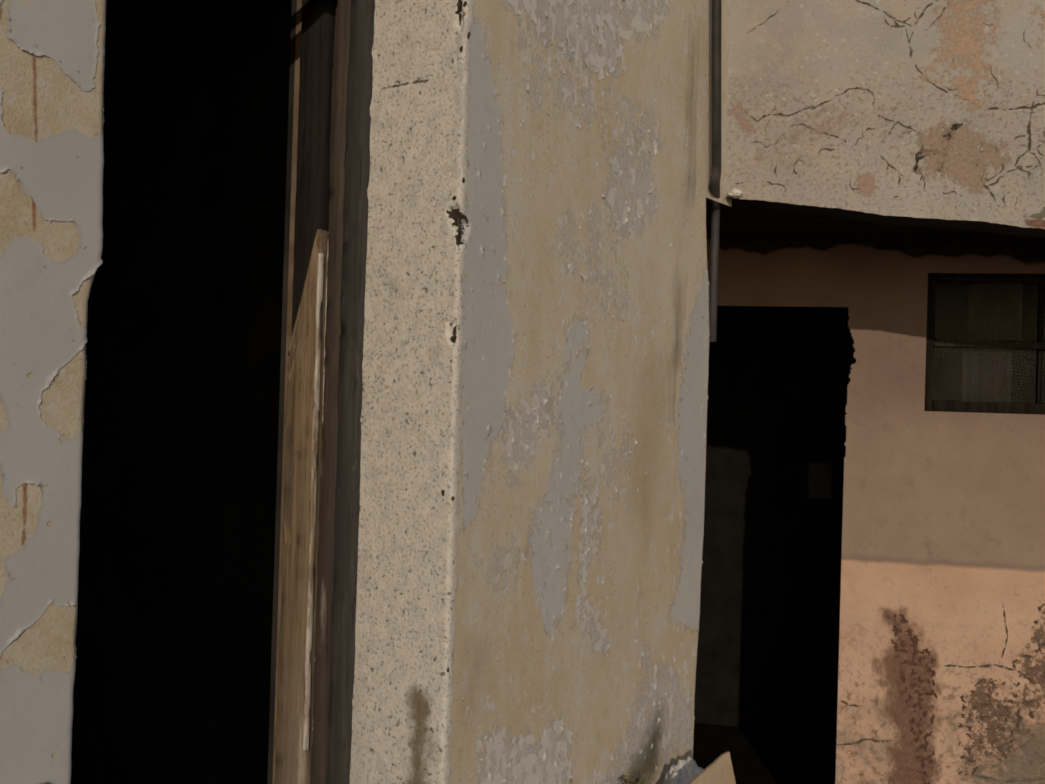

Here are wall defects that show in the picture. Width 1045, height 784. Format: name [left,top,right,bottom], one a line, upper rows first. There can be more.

peeling [0,163,84,267]
peeling [0,0,106,146]
peeling [441,0,558,531]
peeling [502,0,707,140]
crack [736,0,1045,207]
spalling [911,117,1011,193]
peeling [35,257,103,444]
peeling [0,458,47,611]
peeling [462,220,710,784]
peeling [0,595,78,681]
leakage [410,692,429,784]
leakage [874,610,938,784]